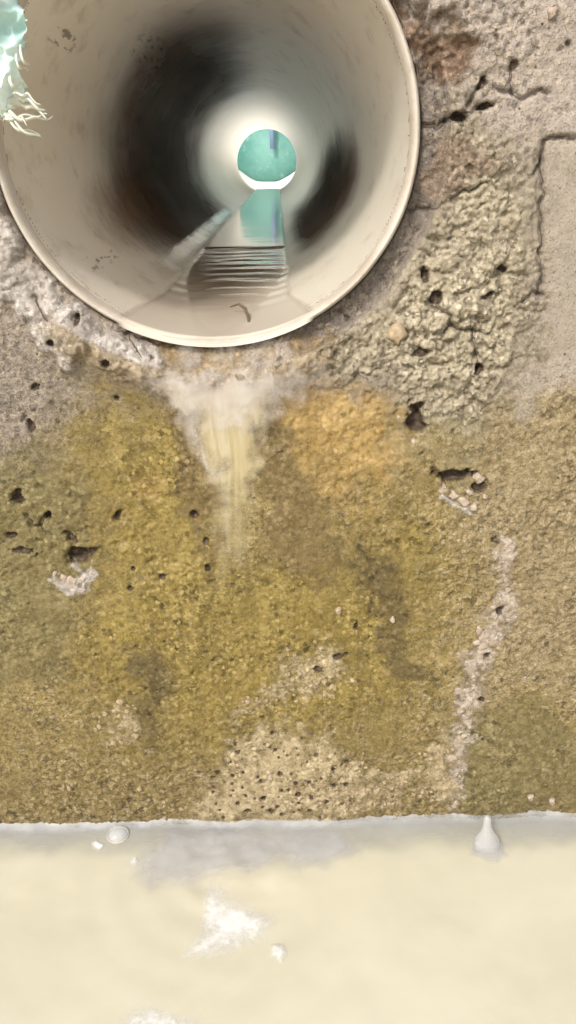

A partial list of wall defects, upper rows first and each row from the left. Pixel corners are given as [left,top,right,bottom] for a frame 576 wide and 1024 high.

crack [408,73,547,136]
crack [409,182,486,211]
crack [523,136,574,301]
damp [166,412,219,549]
damp [251,419,341,586]
spalling [431,468,488,517]
damp [447,535,519,811]